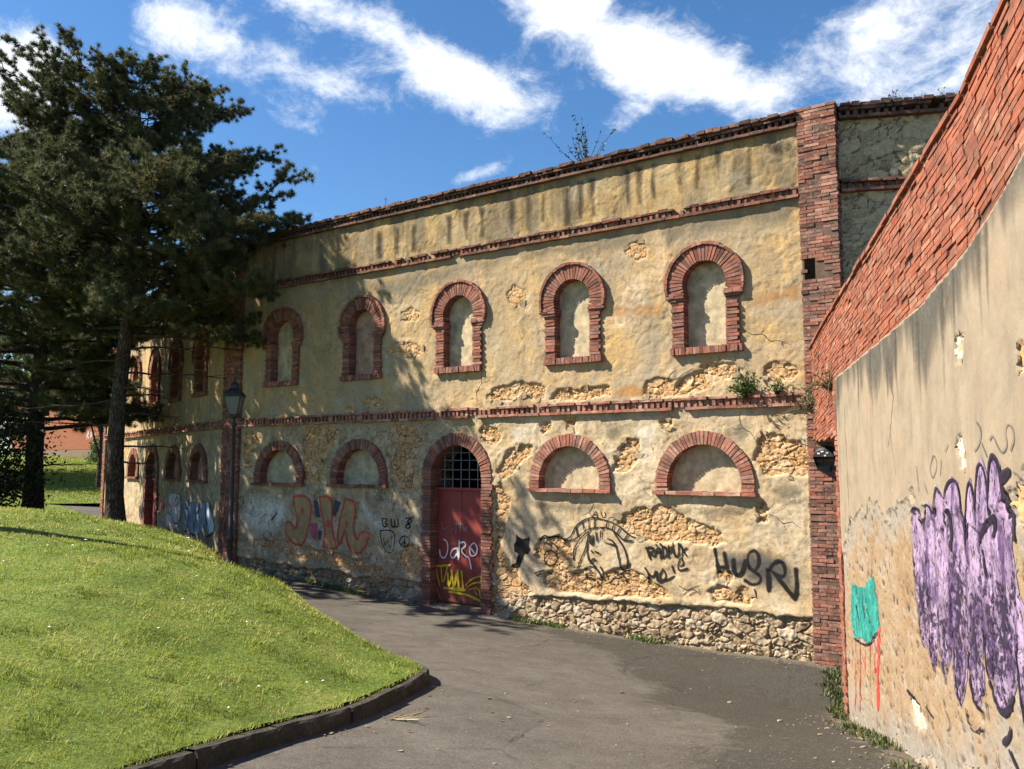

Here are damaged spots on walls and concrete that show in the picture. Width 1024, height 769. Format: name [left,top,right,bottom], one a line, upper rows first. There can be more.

damp [565,179,594,225]
spalling [623,239,648,261]
spalling [953,329,964,363]
spalling [487,381,611,404]
spalling [644,362,741,400]
spalling [762,359,799,383]
spalling [754,429,809,480]
spalling [479,424,669,603]
spalling [611,504,725,547]
spalling [843,466,1024,769]